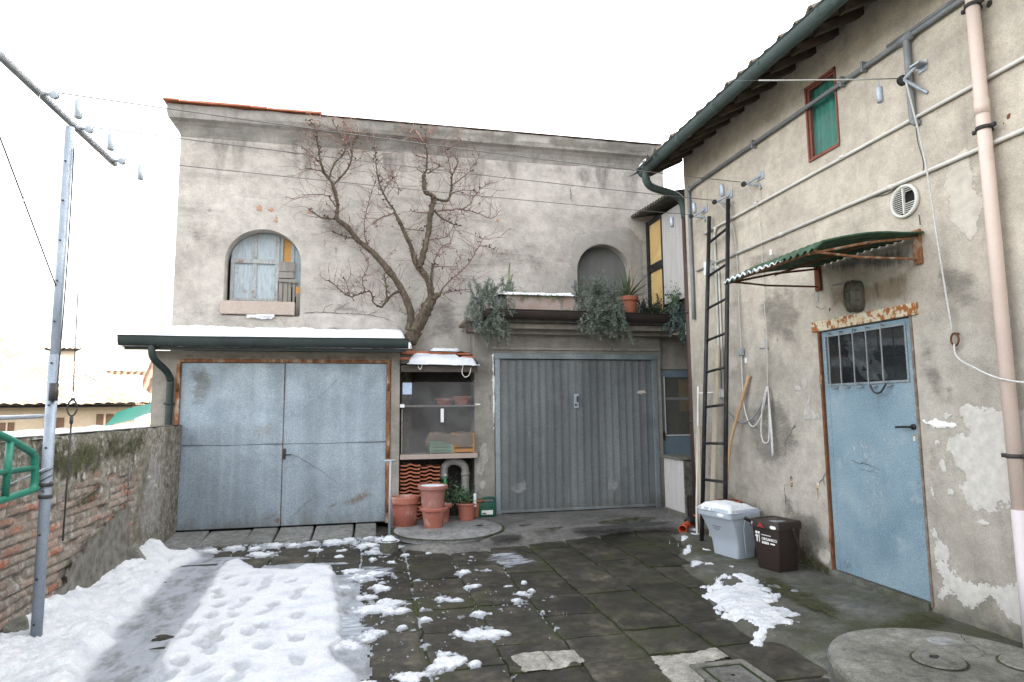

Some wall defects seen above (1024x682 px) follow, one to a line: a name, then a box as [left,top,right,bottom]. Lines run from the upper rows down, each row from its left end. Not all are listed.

damp [756,407,791,459]
peeling [934,403,1011,526]
peeling [930,519,1021,626]